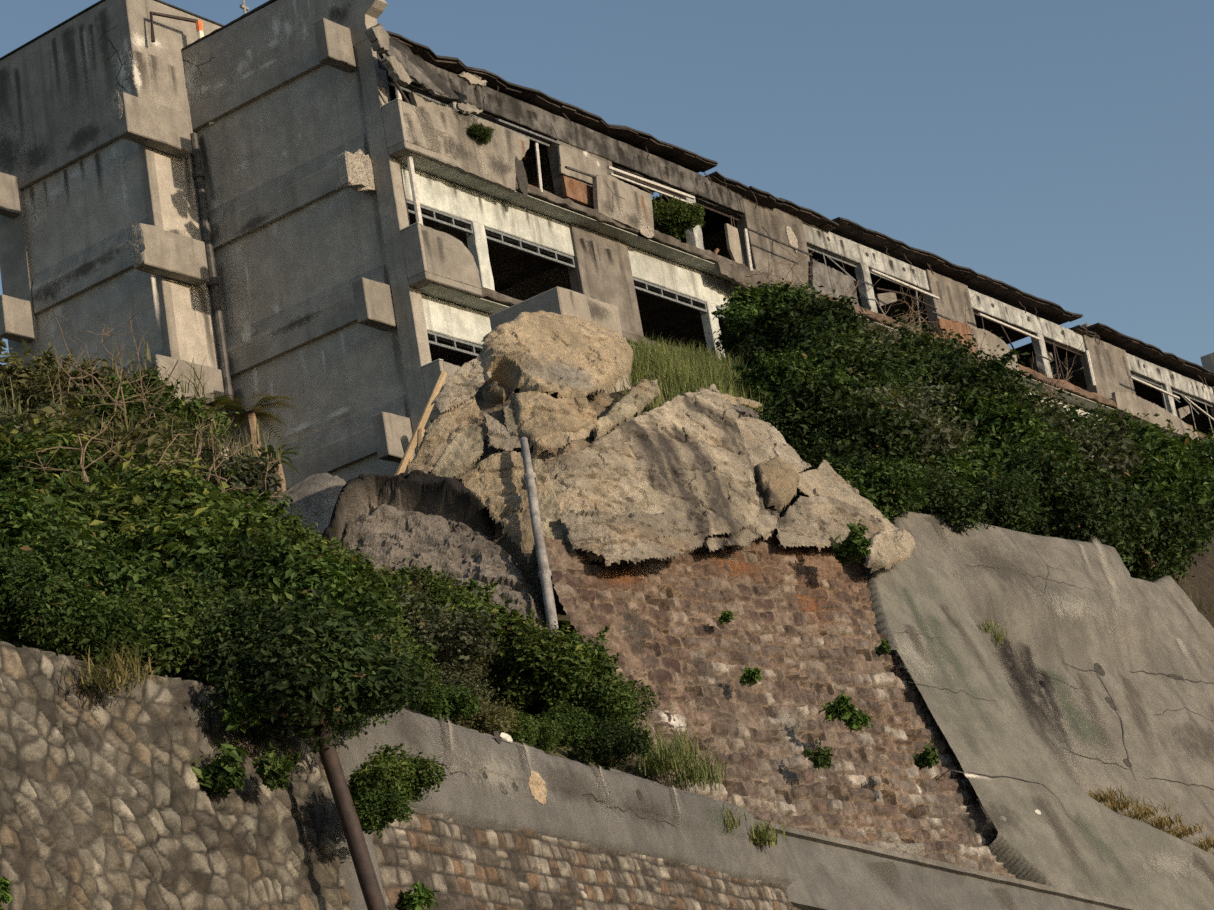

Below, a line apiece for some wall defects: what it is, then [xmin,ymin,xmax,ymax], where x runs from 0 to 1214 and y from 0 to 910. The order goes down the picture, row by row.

leakage [52,12,161,107]
crack [98,22,128,92]
leakage [171,60,224,94]
leakage [1001,640,1065,732]
crack [1036,662,1214,790]
crack [933,769,1075,822]